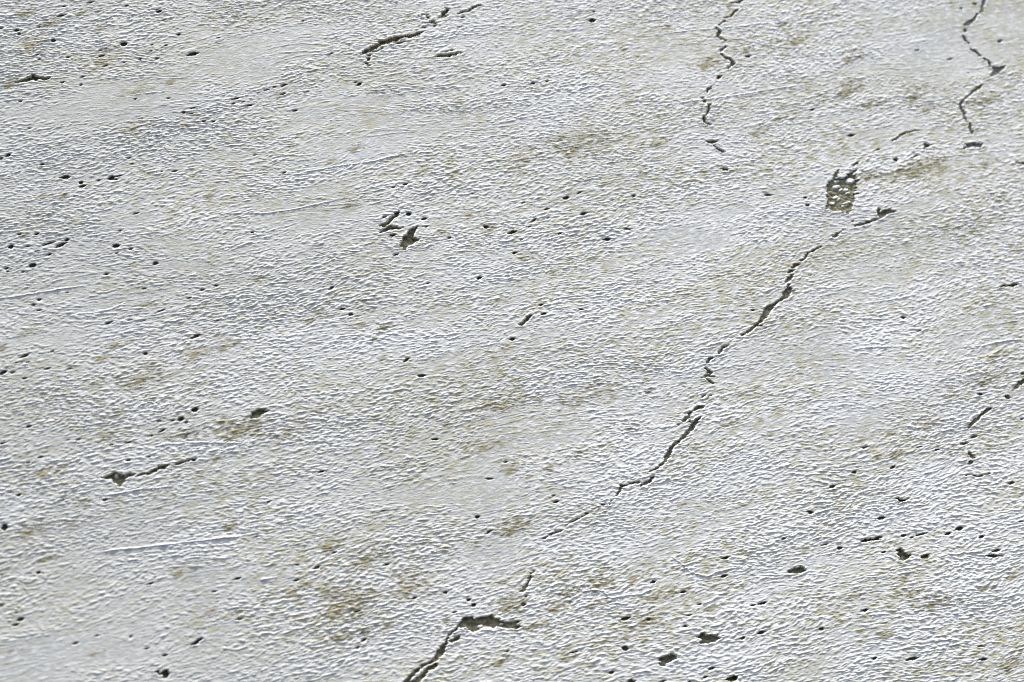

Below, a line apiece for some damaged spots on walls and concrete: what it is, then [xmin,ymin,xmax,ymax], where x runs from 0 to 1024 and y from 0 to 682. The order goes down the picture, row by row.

crack [361,5,481,67]
crack [701,0,743,171]
crack [959,0,1006,149]
spalling [379,211,428,256]
spalling [825,162,859,214]
crack [542,208,896,539]
crack [404,570,534,682]